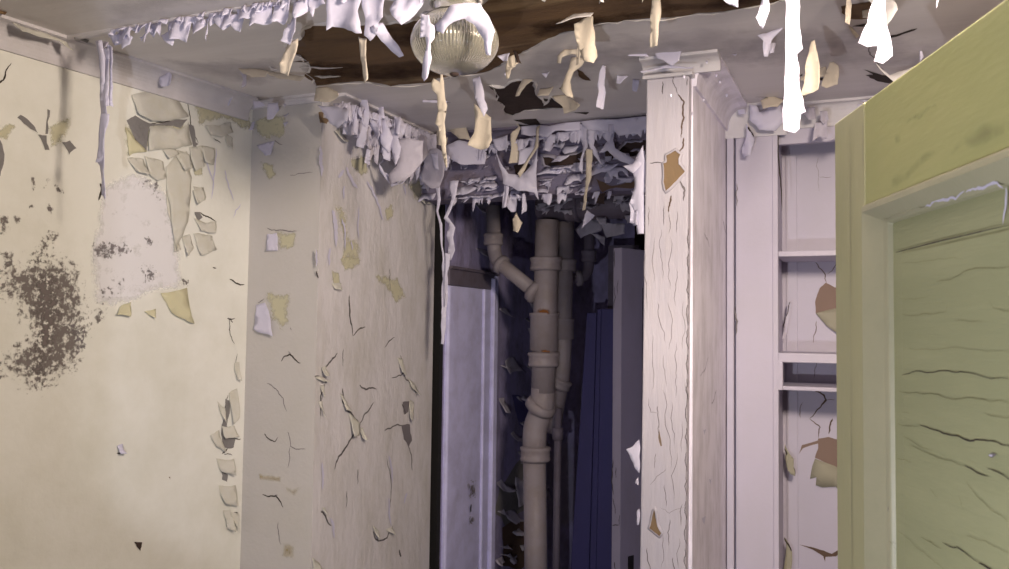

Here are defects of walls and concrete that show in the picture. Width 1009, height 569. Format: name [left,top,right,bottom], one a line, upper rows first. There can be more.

peeling [841,0,924,83]
crack [662,77,688,135]
peeling [0,0,836,344]
crack [776,137,784,204]
damp [92,242,132,258]
damp [0,230,125,391]
peeling [211,357,242,533]
crack [281,271,376,538]
spalling [385,355,421,471]
crack [644,207,688,569]
peeling [785,391,837,488]
crack [802,545,838,560]